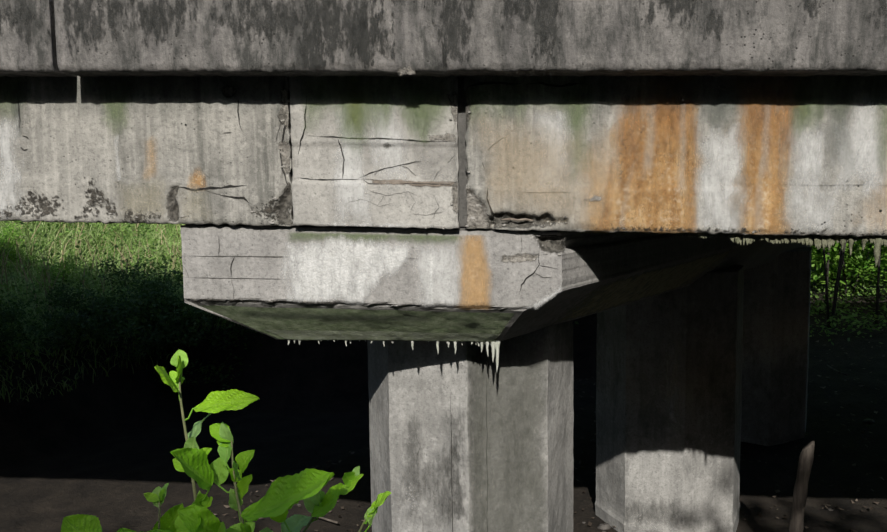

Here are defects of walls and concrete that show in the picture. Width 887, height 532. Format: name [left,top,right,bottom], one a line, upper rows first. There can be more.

damp [63,0,198,55]
damp [211,0,395,70]
damp [648,0,723,39]
crack [180,185,249,203]
spalling [251,141,293,225]
crack [275,98,456,218]
spalling [450,165,568,263]
corrosion [593,86,697,231]
corrosion [746,103,788,233]
corrosion [464,236,487,309]
crack [520,237,557,291]
damp [266,330,543,532]